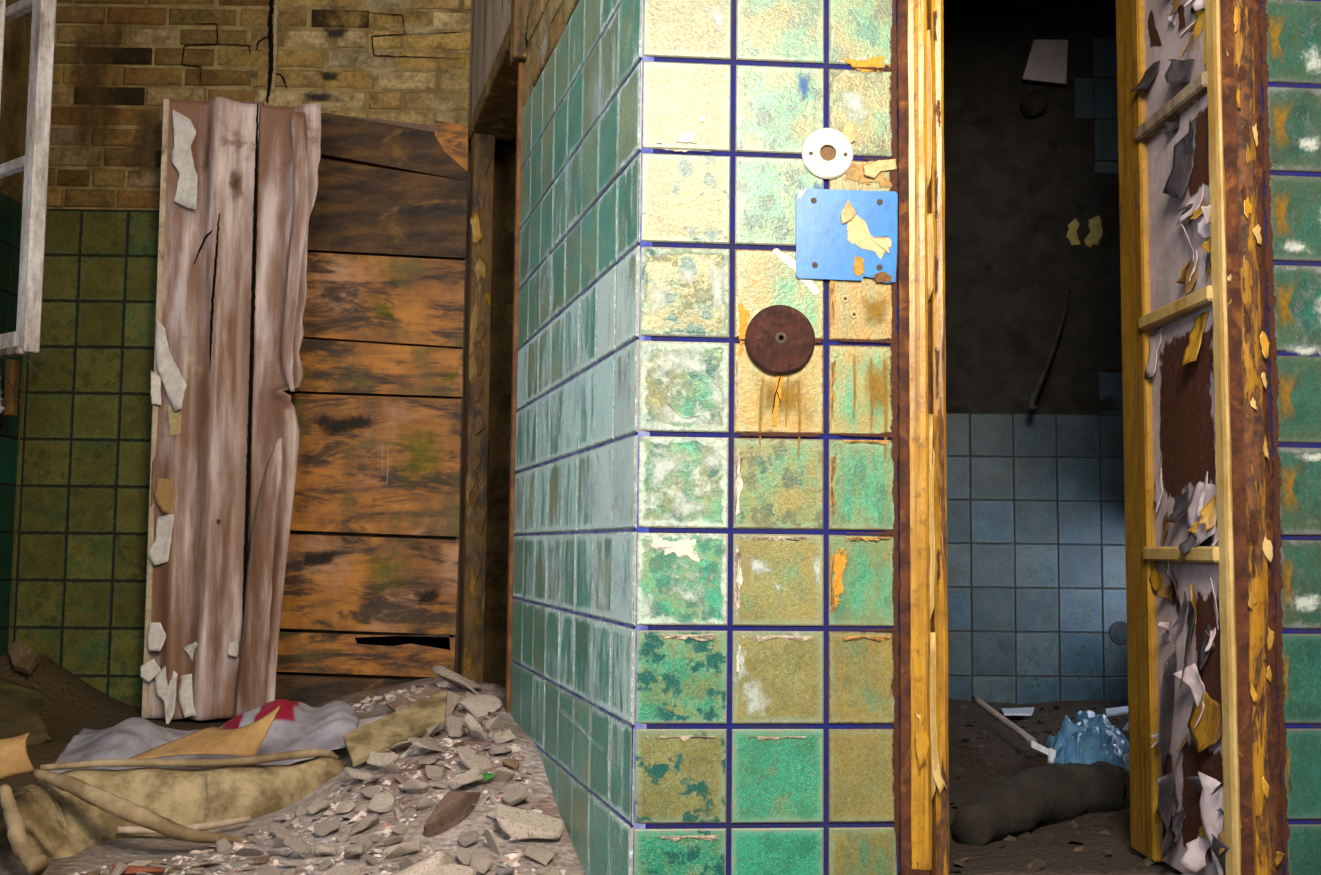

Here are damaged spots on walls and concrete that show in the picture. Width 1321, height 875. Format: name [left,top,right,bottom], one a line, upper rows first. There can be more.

crack [181,0,287,103]
peeling [1129,0,1207,93]
peeling [1246,122,1258,164]
peeling [1163,106,1211,295]
peeling [1244,196,1262,245]
rust [737,294,750,356]
peeling [1250,331,1270,410]
rust [739,375,821,456]
rust [839,0,913,875]
rust [1237,0,1297,875]
peeling [1262,536,1273,562]
peeling [1250,627,1274,702]